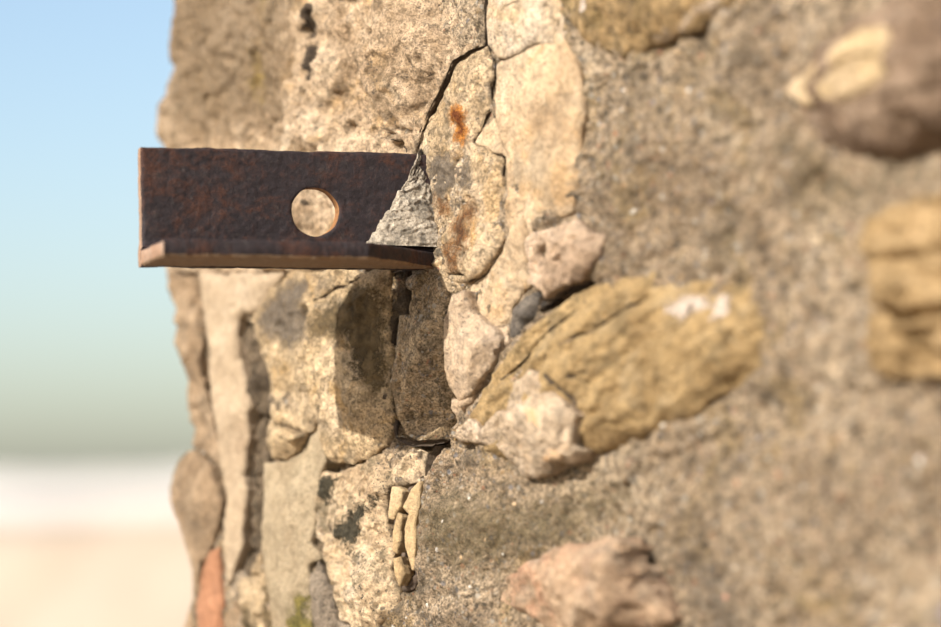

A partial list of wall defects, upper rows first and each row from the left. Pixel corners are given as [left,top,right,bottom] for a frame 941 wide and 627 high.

crack [387,0,497,152]
rust [449,103,469,159]